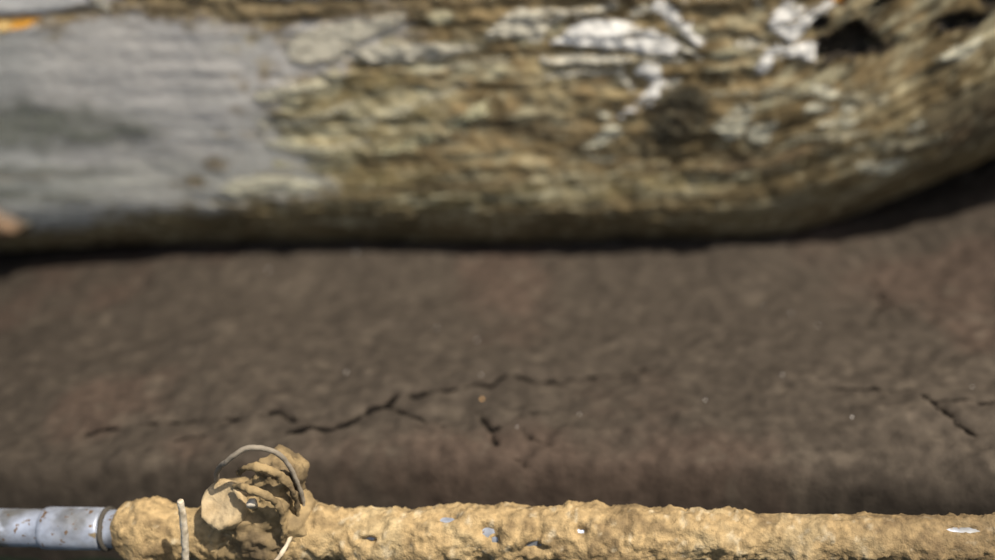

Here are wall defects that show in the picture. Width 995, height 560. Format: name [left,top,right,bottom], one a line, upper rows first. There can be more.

peeling [286,14,474,66]
peeling [485,0,704,99]
spalling [736,1,896,74]
spalling [928,0,995,61]
leakage [0,103,149,144]
peeling [585,108,634,162]
peeling [710,84,951,174]
peeling [220,175,319,197]
crack [269,368,656,434]
crack [85,418,240,442]
crack [480,413,548,446]